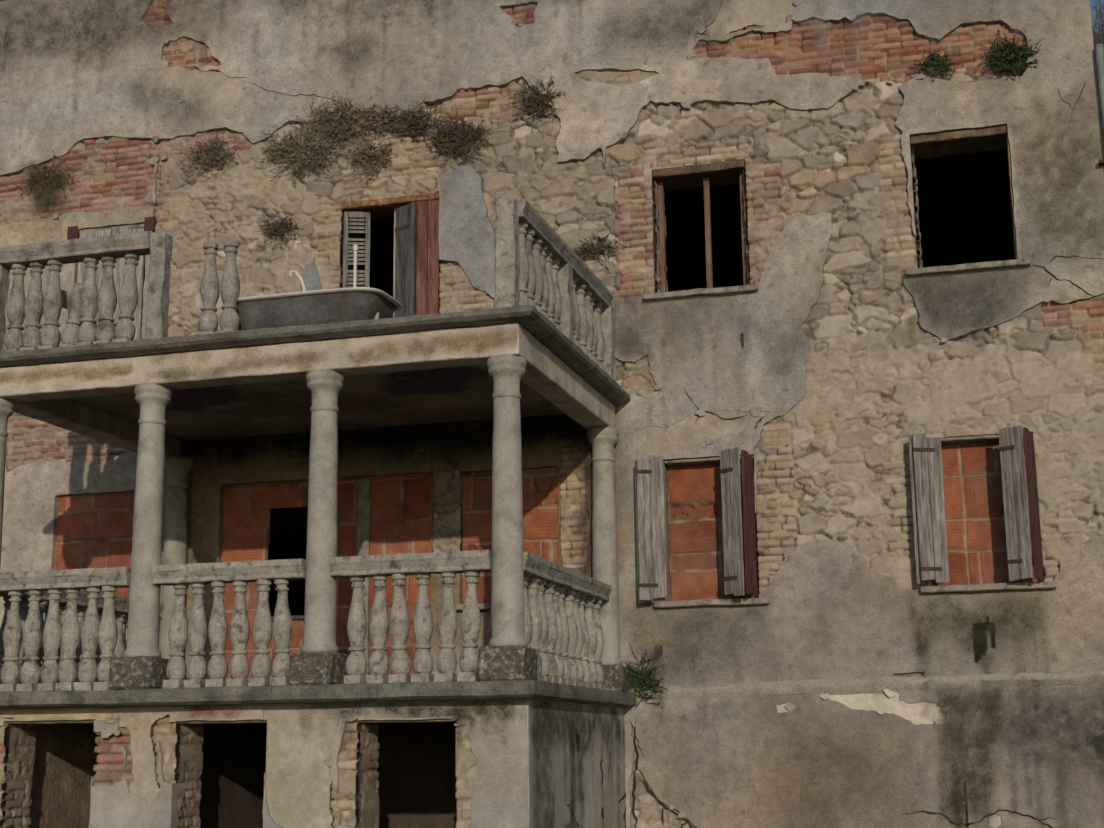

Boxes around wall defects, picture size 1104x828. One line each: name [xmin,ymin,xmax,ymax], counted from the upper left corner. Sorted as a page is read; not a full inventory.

spalling [0,0,1104,594]
crack [1029,255,1102,296]
peeling [0,705,183,828]
peeling [256,702,362,828]
leakage [533,701,625,828]
crack [565,718,693,828]
peeling [820,689,954,725]
crack [898,809,1055,828]
leakage [939,688,1104,825]